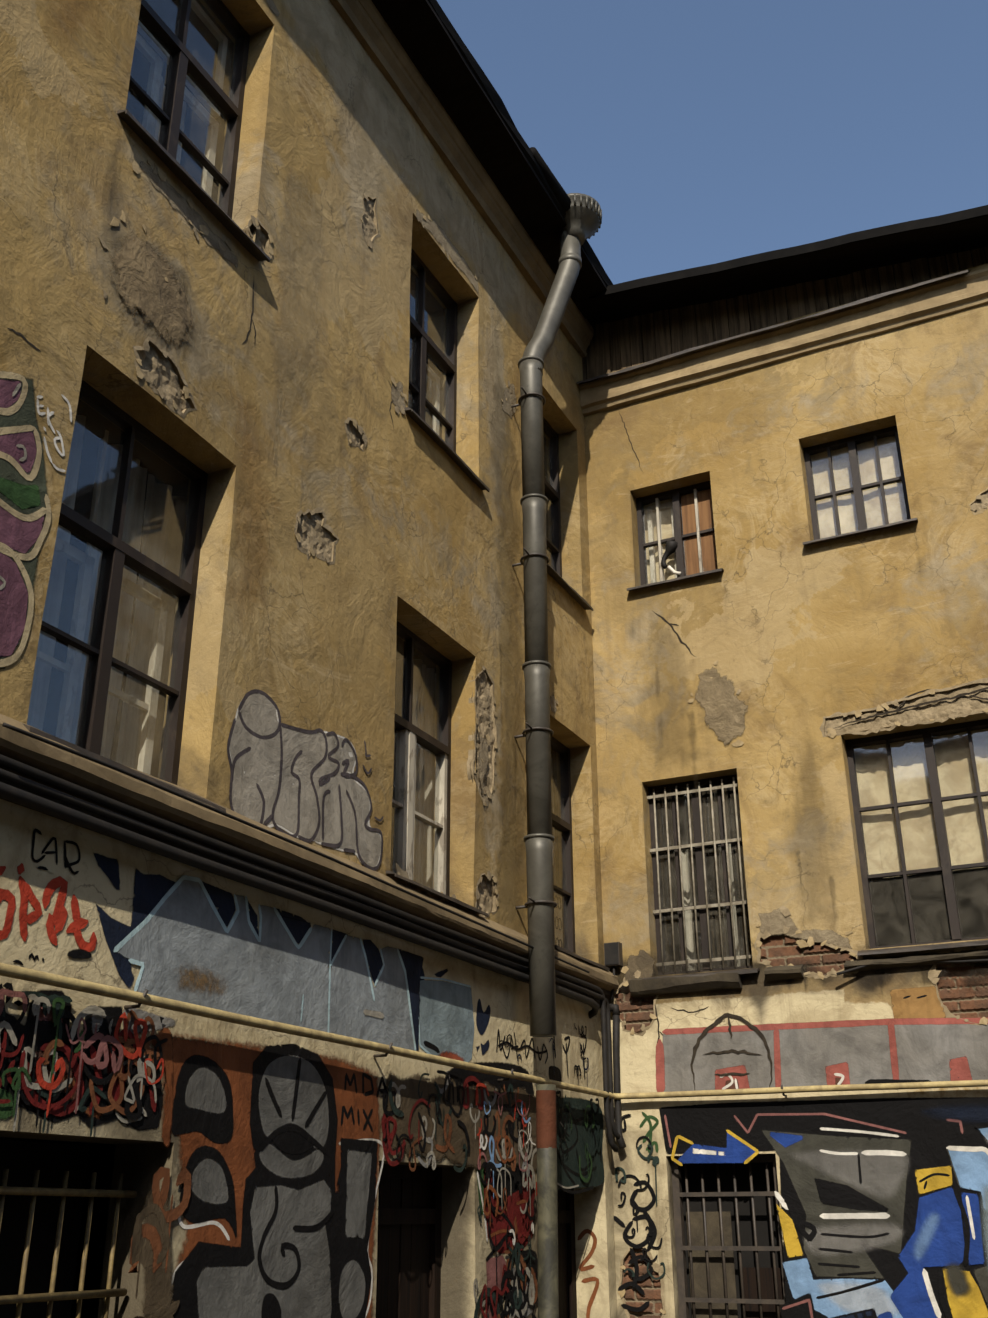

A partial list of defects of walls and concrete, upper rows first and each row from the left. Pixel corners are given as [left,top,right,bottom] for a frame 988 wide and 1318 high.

flaking render [132,160,238,267]
flaking render [244,215,274,262]
crack [243,282,256,344]
flaking render [133,336,197,418]
flaking render [344,417,367,452]
flaking render [969,488,988,515]
flaking render [294,507,339,565]
crack [652,610,696,657]
flaking render [819,678,988,738]
flaking render [754,906,864,980]
flaking render [928,945,988,1025]
flaking render [618,1243,666,1318]